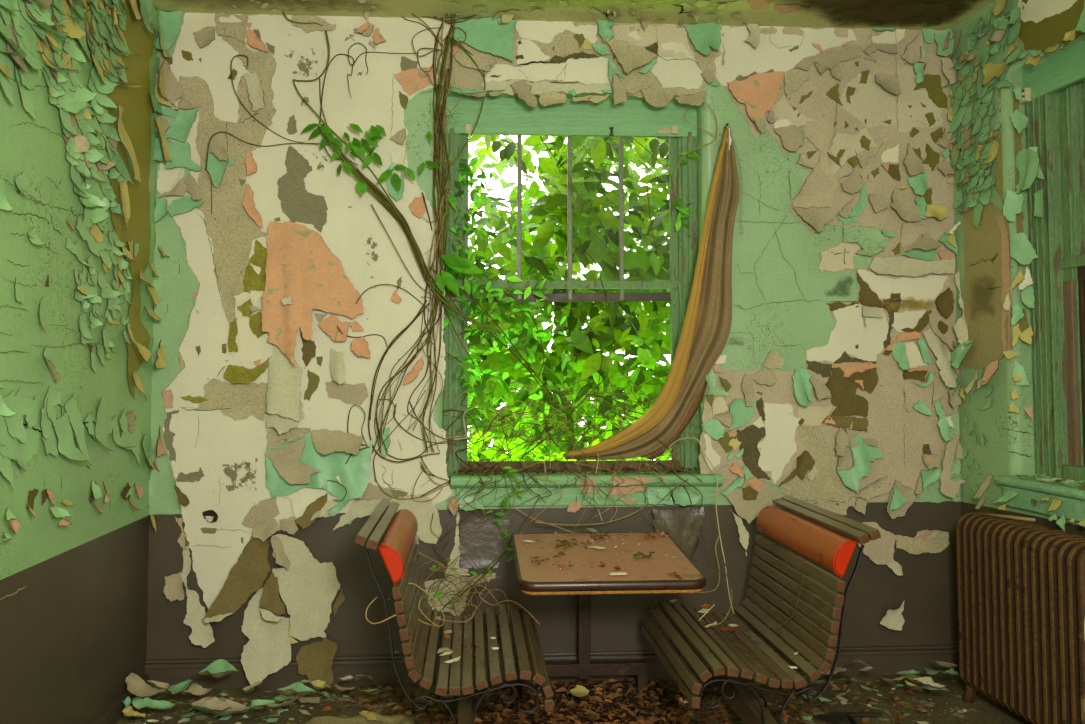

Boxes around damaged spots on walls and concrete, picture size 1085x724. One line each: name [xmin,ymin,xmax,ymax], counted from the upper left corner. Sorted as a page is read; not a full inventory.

damp [833,0,966,26]
peeling [964,0,1085,66]
flaking render [126,9,1045,691]
peeling [0,385,141,491]
peeling [3,507,21,542]
peeling [27,489,75,527]
peeling [89,480,110,514]
peeling [121,483,144,511]
peeling [1031,497,1085,531]